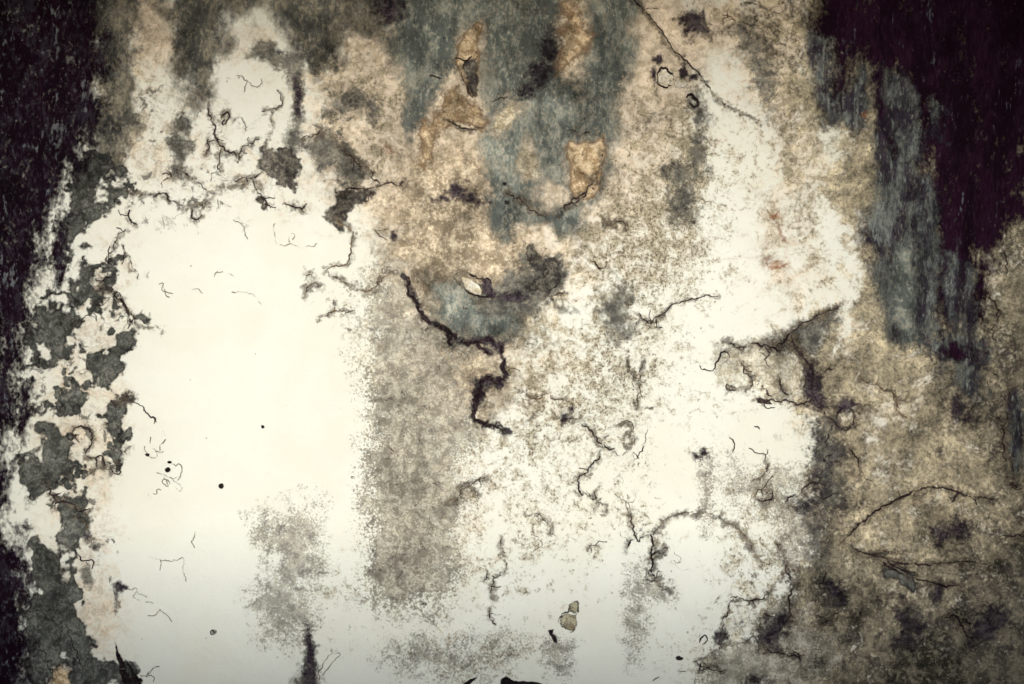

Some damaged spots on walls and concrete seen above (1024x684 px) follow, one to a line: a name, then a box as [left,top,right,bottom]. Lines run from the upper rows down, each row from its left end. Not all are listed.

peeling [14,150,151,684]
water stain [0,0,640,684]
crack [80,75,864,681]
peeling [418,0,595,170]
peeling [549,601,579,643]
peeling [566,135,607,200]
crack [630,0,762,127]
crack [709,0,800,26]
crack [699,303,1022,641]
water stain [789,0,1024,425]